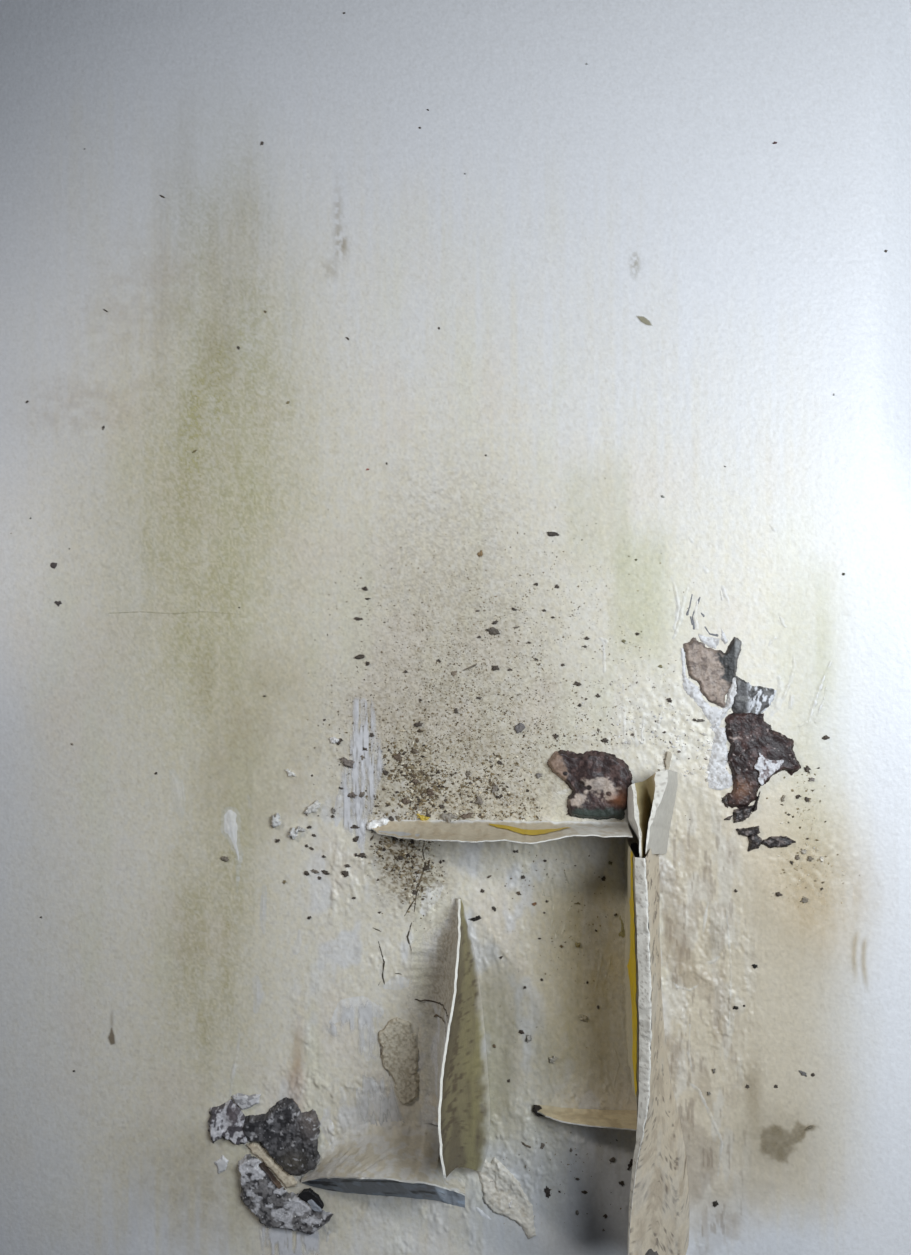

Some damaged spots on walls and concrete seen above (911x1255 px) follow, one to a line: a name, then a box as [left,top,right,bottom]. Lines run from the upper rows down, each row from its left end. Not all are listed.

peeling [208,881,536,1255]
leakage [384,841,432,896]
peeling [271,698,689,1255]